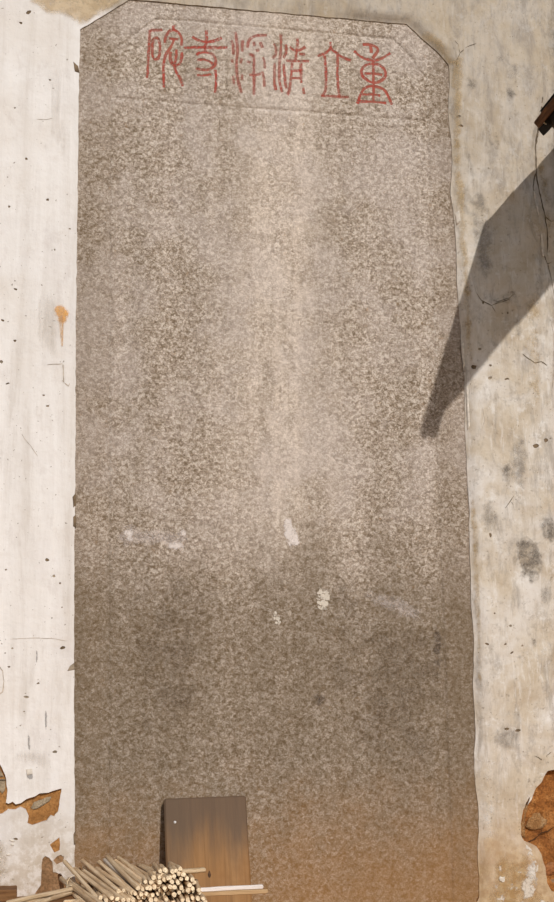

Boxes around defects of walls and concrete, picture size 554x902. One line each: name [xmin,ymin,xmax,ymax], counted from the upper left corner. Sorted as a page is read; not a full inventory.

crack [533,100,554,292]
rust [55,306,68,344]
damp [520,542,539,581]
spalling [0,765,61,825]
spalling [495,770,554,902]